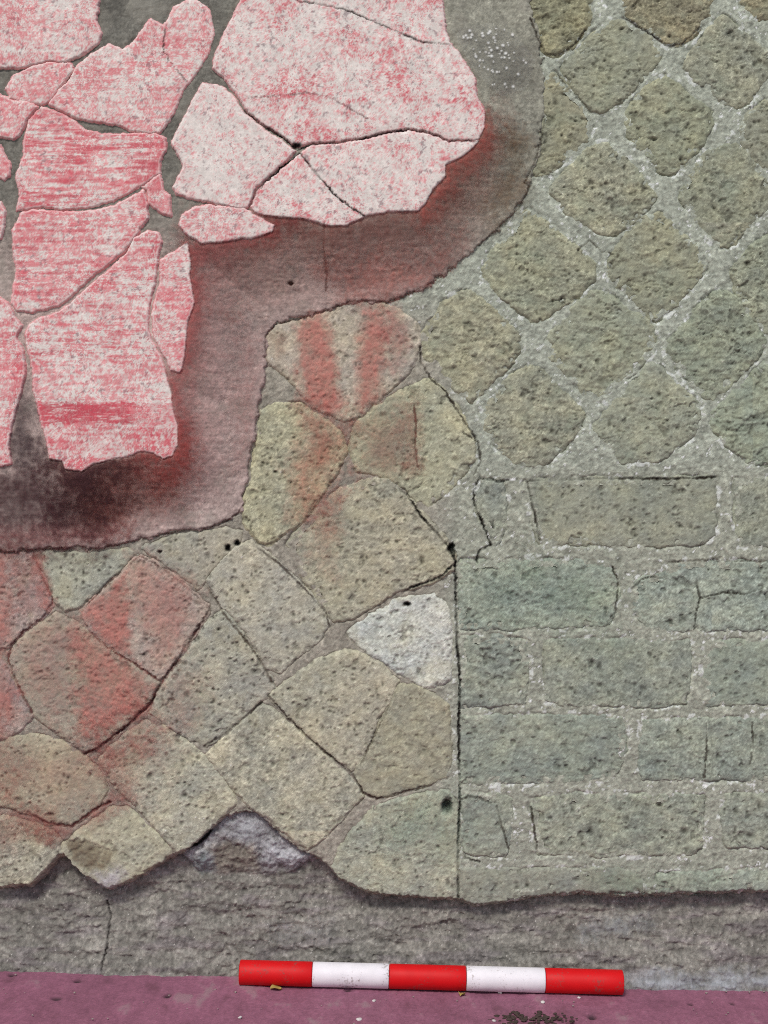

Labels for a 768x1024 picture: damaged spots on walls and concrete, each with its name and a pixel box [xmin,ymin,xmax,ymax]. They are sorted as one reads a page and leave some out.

water stain [463,28,527,87]
water stain [422,124,487,216]
flaking render [0,0,545,553]
water stain [0,219,280,547]
water stain [299,319,341,413]
crack [619,474,715,482]
crack [407,347,502,896]
crack [695,586,741,621]
spalling [182,811,317,876]